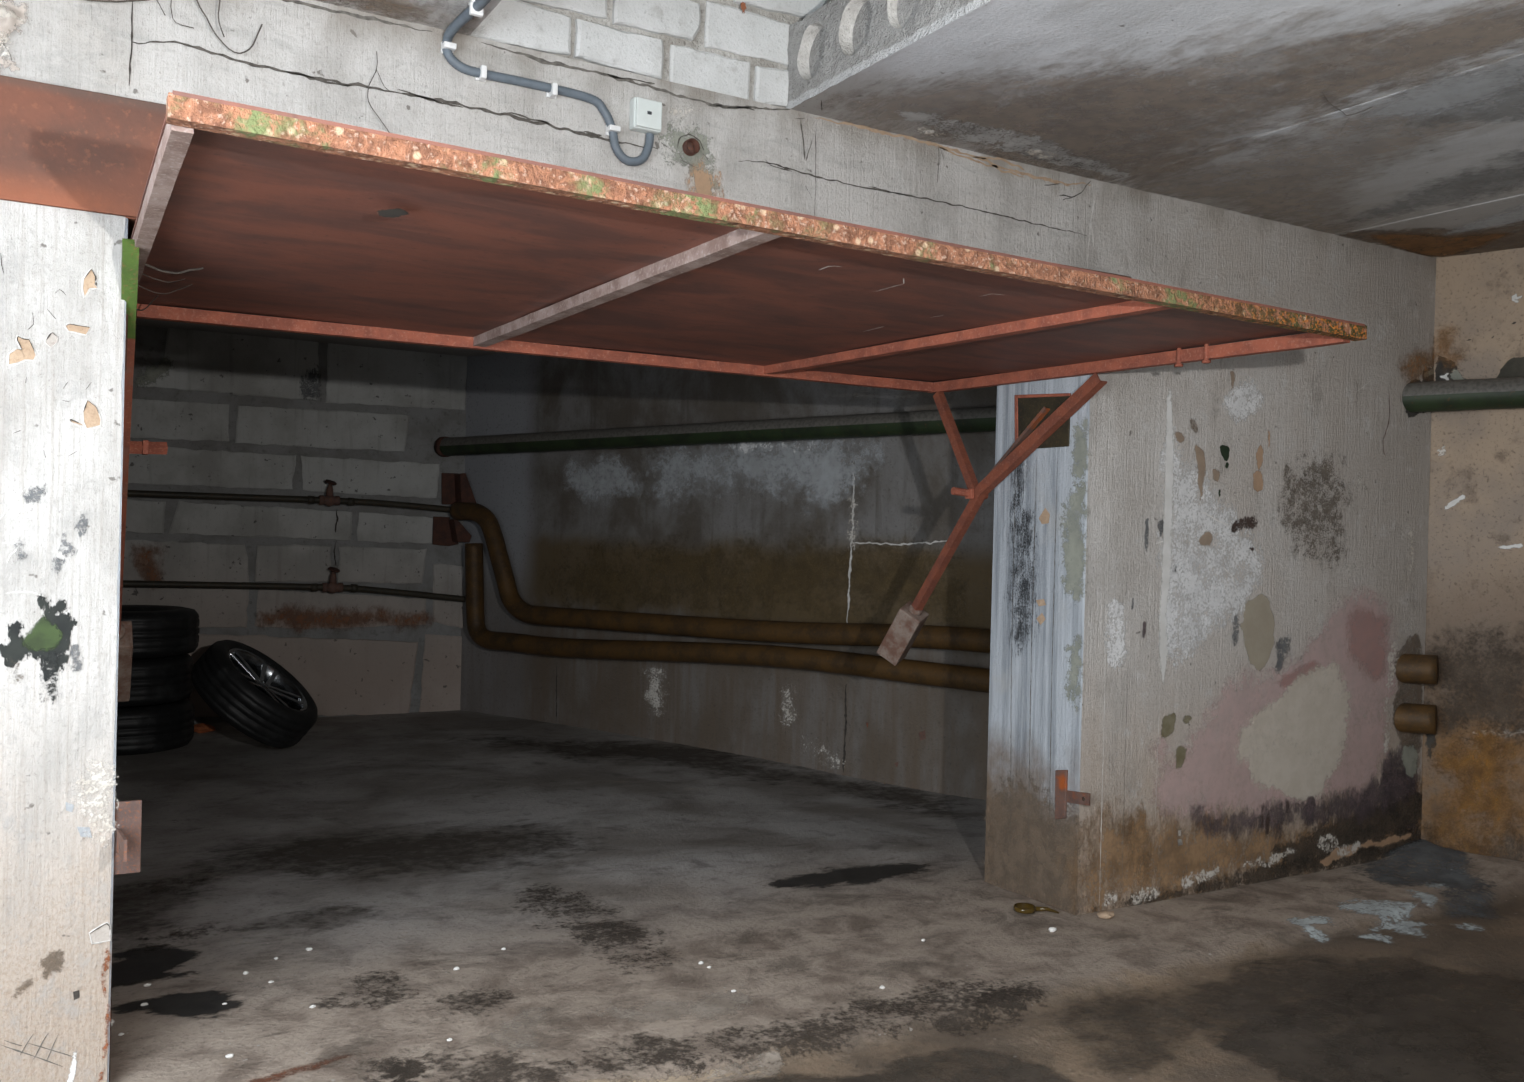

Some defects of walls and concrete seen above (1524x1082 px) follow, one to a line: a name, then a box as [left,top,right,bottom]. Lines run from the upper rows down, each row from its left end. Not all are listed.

crack [129,0,1524,268]
damp [853,1,1524,257]
spalling [81,268,98,299]
spalling [6,322,91,366]
spalling [70,399,103,430]
peeling [1220,445,1230,469]
damp [1193,630,1524,868]
damp [1181,867,1219,889]
damp [1104,886,1159,906]